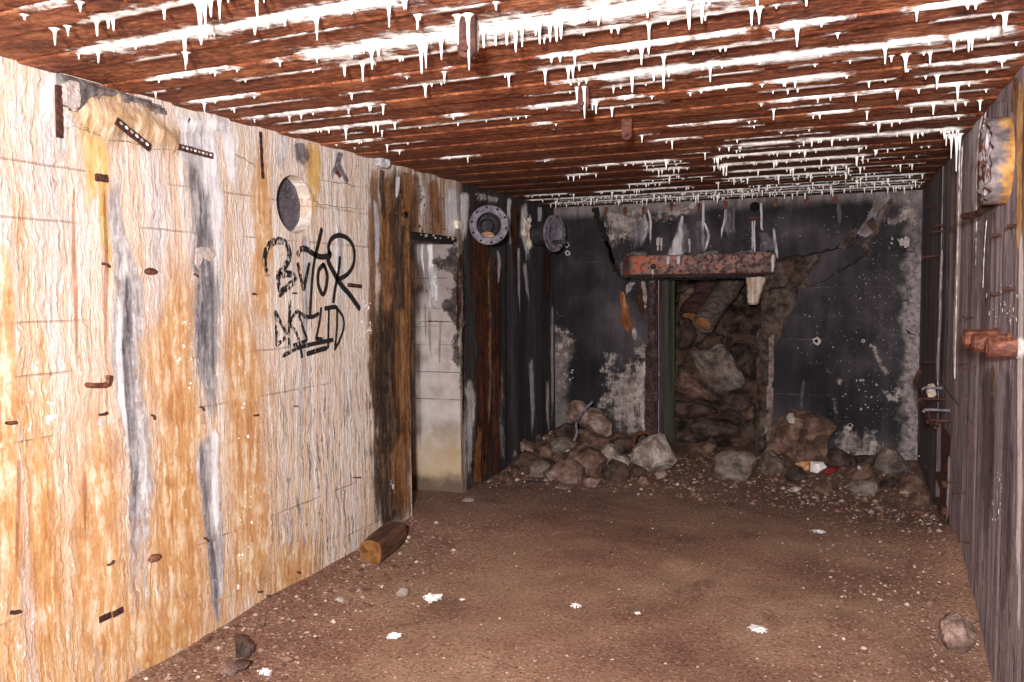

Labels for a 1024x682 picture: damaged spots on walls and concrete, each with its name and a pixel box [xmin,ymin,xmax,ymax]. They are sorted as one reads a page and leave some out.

rust [81,121,111,328]
rust [0,249,209,668]
damp [196,429,224,618]
rust [221,152,318,604]
damp [19,0,1024,525]
crack [592,207,874,285]